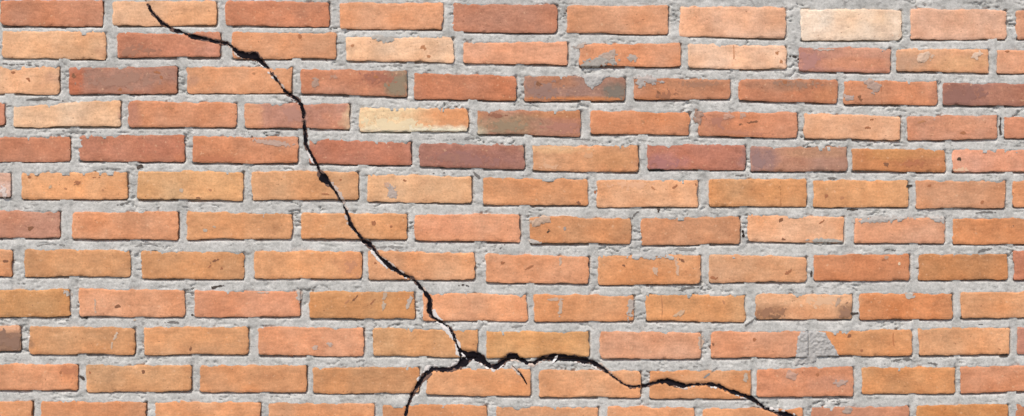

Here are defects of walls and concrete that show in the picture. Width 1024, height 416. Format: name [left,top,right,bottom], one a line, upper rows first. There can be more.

crack [146,3,797,416]